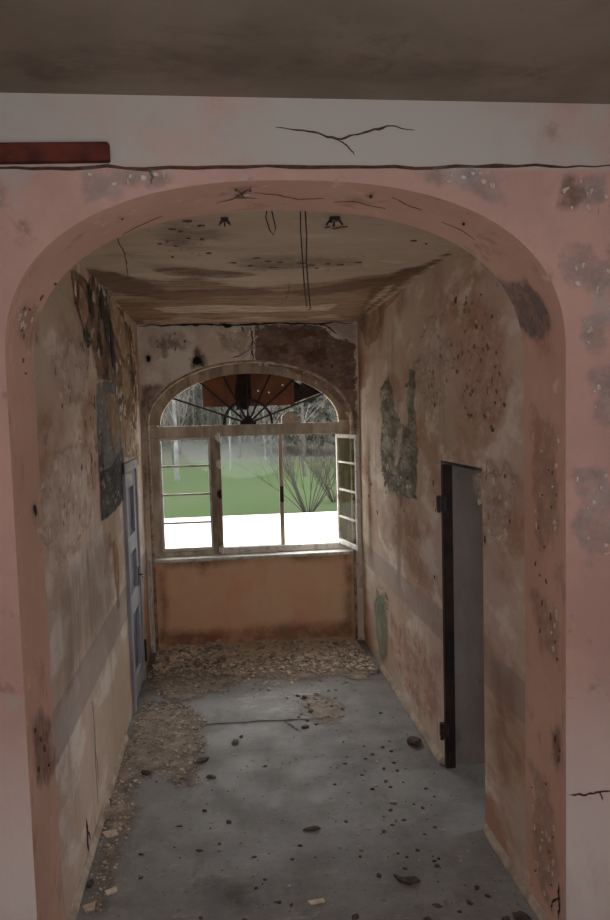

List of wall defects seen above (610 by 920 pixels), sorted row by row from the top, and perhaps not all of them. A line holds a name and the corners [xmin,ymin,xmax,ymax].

crack [218,193,324,203]
crack [0,125,610,184]
water stain [89,254,451,347]
flaking render [72,270,140,520]
flaking render [189,349,207,367]
flaking render [253,323,358,424]
flaking render [380,369,418,512]
crack [571,790,610,800]